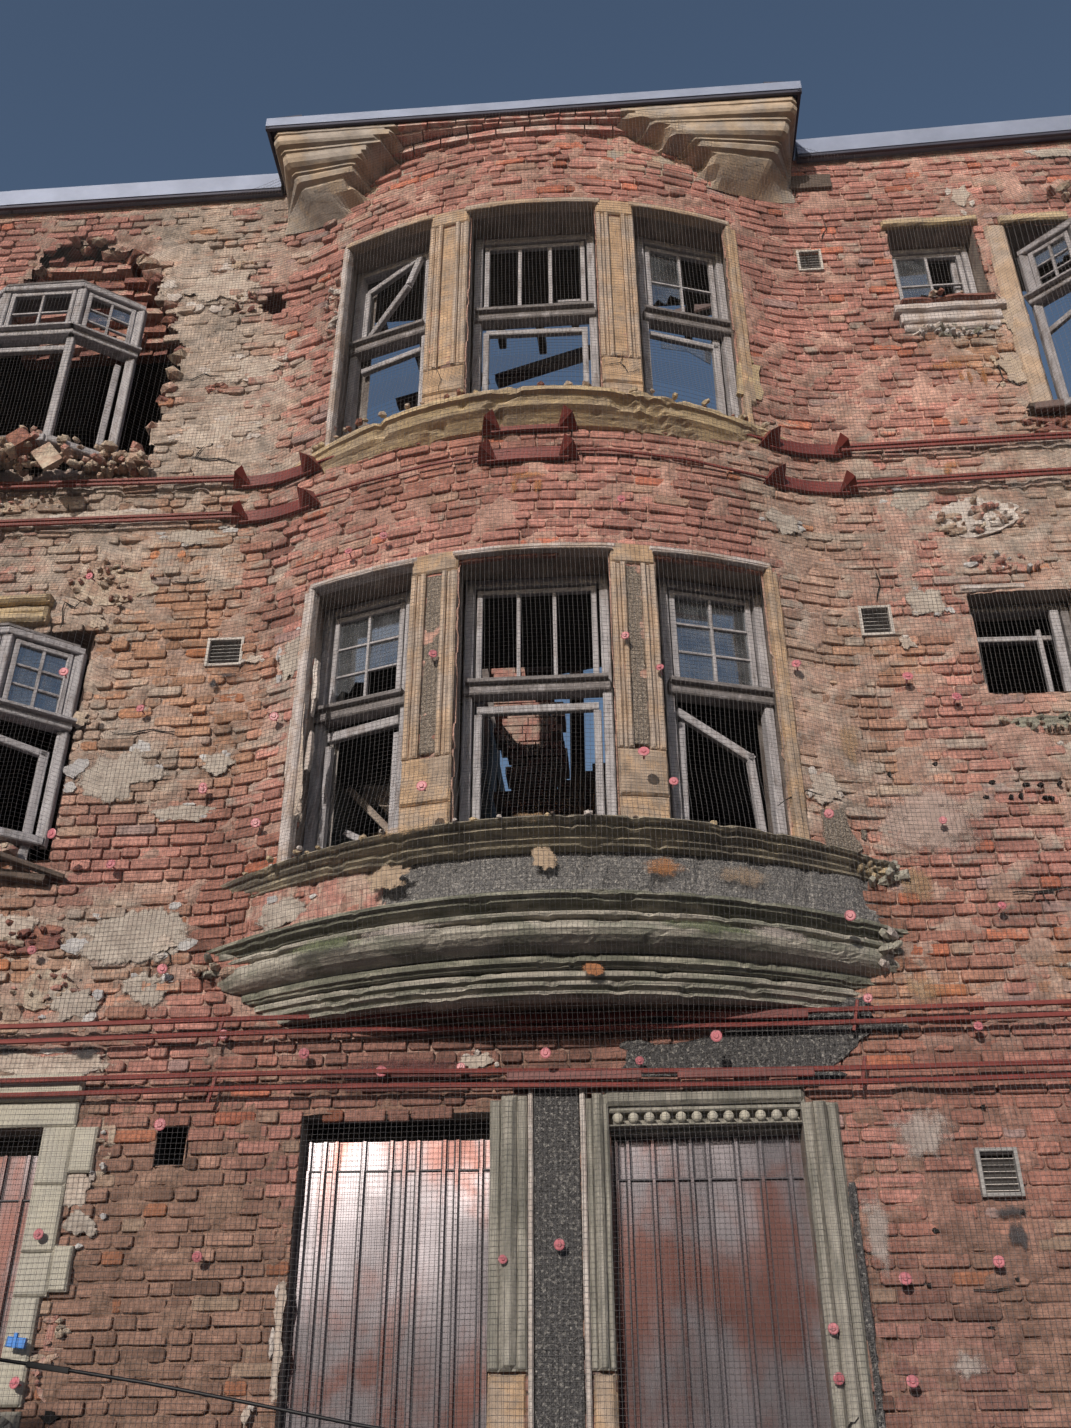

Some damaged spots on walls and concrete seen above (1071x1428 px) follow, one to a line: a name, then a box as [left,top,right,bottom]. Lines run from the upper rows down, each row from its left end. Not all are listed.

spalling [11,233,288,403]
peeling [145,412,262,448]
peeling [62,740,168,803]
peeling [199,750,236,776]
flaking render [363,865,410,891]
flaking render [531,847,557,870]
peeling [0,902,235,1006]
spalling [9,968,104,1022]
peeling [240,1281,287,1428]